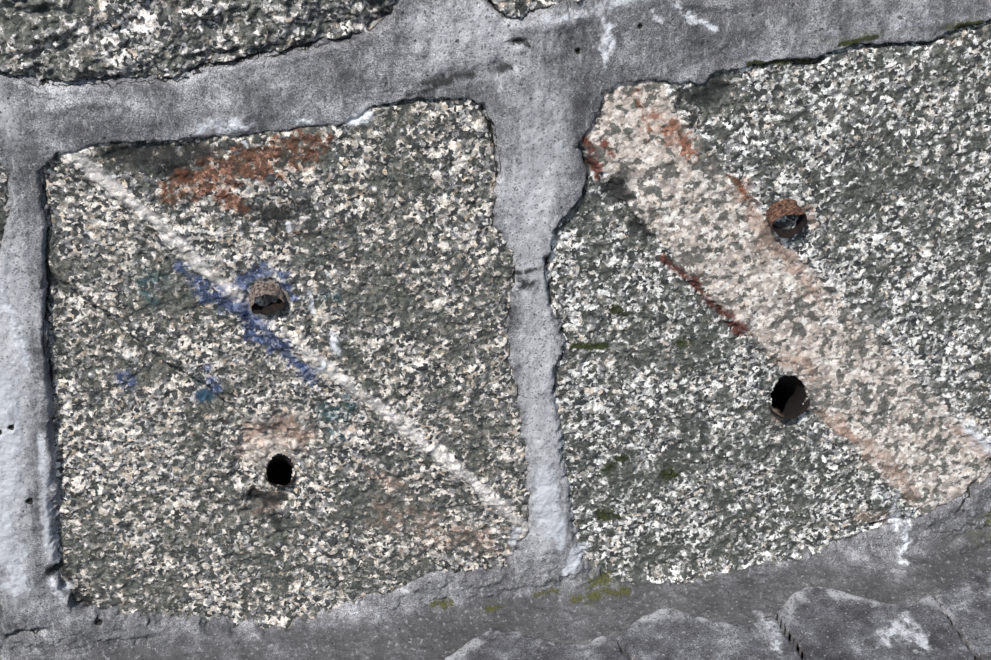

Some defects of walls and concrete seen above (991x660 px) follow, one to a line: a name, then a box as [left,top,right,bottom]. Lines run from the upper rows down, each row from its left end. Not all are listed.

water stain [961,425,991,455]